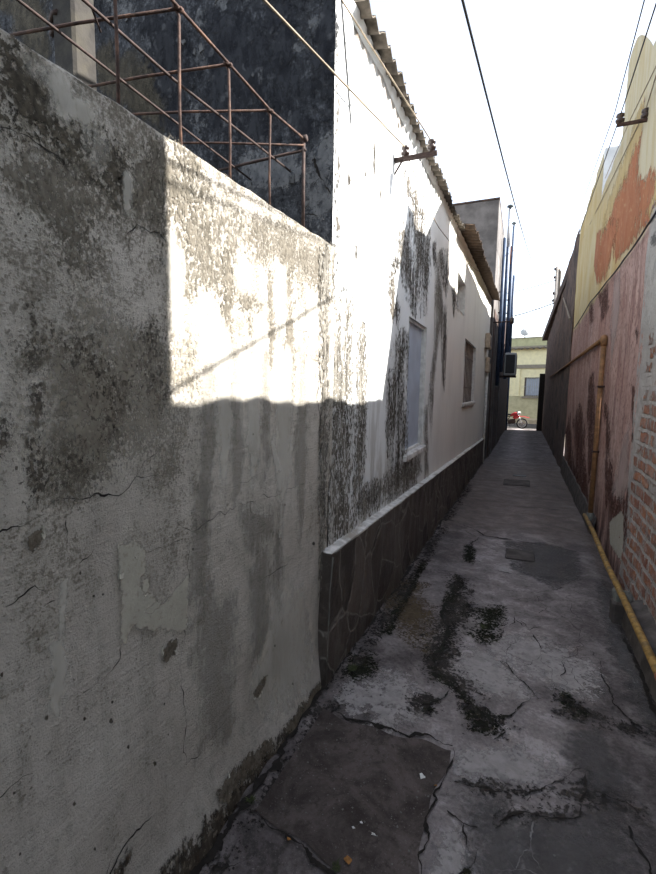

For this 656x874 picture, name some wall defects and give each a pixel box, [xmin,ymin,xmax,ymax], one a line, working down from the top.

damp [0,0,342,522]
peeling [589,96,656,325]
damp [406,252,443,487]
crack [57,451,168,564]
damp [114,848,133,874]
crack [107,816,152,874]
damp [158,483,656,874]
crack [190,684,652,874]
crack [414,525,656,739]